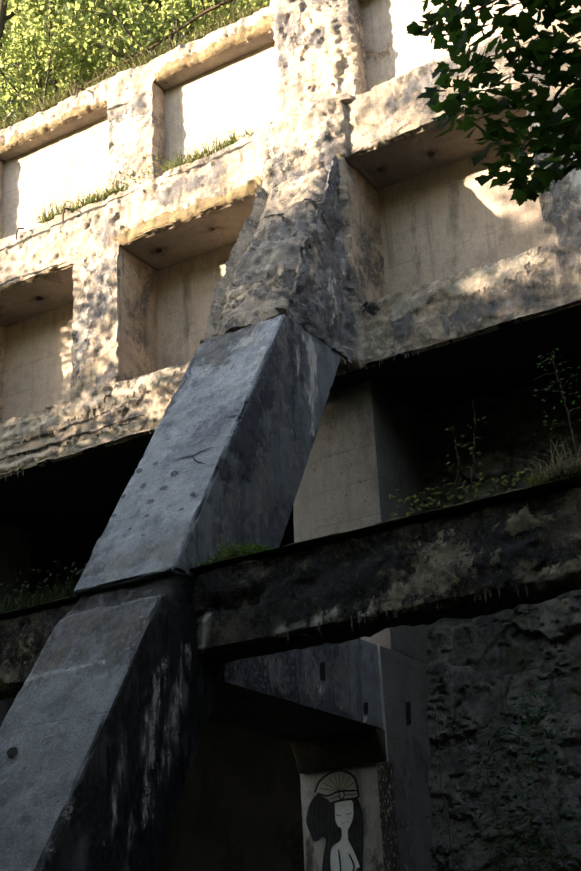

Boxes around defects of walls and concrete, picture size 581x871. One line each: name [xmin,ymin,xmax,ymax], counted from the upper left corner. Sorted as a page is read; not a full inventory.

damp [384,36,503,115]
damp [150,162,225,206]
damp [263,123,339,196]
damp [538,148,581,271]
damp [71,217,121,398]
damp [164,181,351,553]
damp [389,311,414,348]
damp [439,274,539,338]
crack [170,447,215,464]
damp [457,500,552,590]
damp [26,528,416,871]